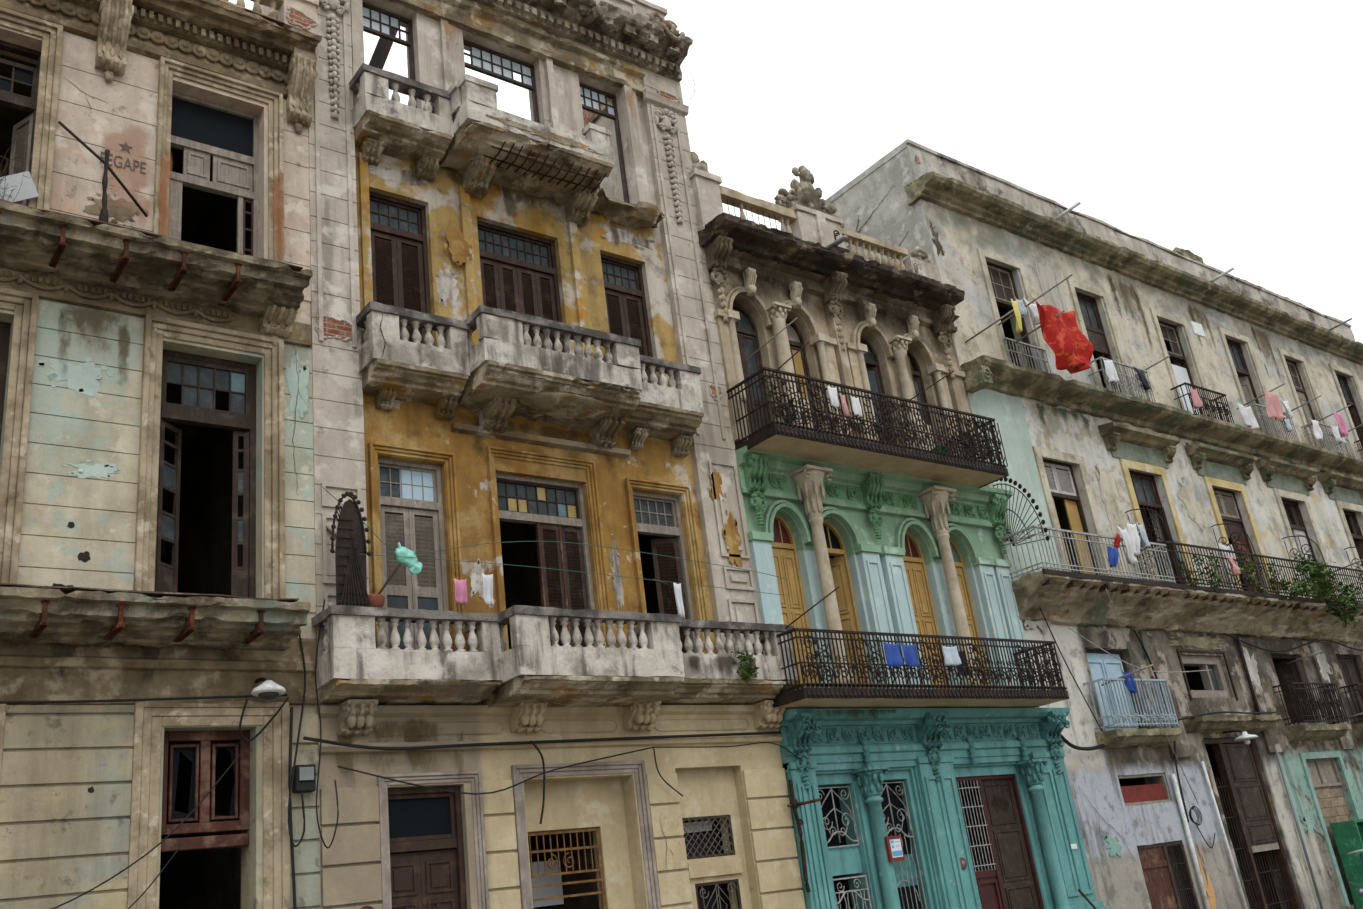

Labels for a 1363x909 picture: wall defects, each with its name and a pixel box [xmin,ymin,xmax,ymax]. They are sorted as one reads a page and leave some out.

corrosion [159,156,171,236]
peeling [436,219,473,312]
damp [61,309,130,366]
spalling [315,315,360,342]
peeling [62,460,120,479]